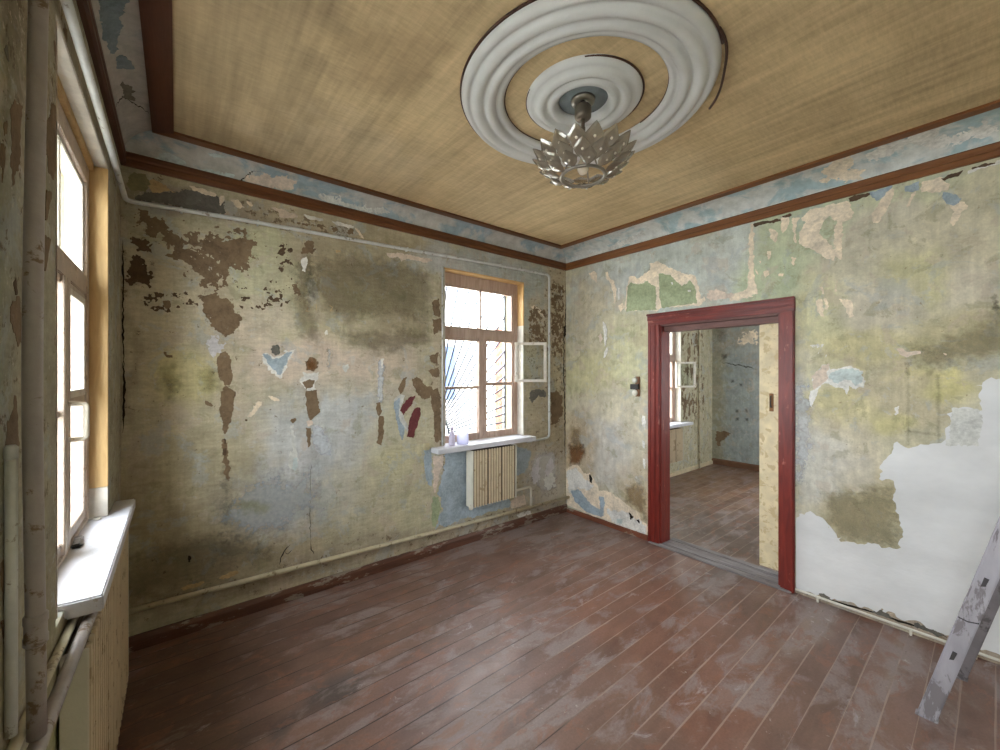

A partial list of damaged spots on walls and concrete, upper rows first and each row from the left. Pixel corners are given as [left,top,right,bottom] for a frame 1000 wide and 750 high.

peeling [98,0,135,70]
peeling [120,81,136,101]
peeling [124,172,316,337]
peeling [272,207,364,239]
peeling [587,160,1000,312]
peeling [432,298,442,335]
peeling [528,284,564,357]
peeling [897,348,921,357]
peeling [205,351,236,481]
peeling [394,352,442,442]
peeling [529,389,563,425]
flaking render [566,465,648,535]